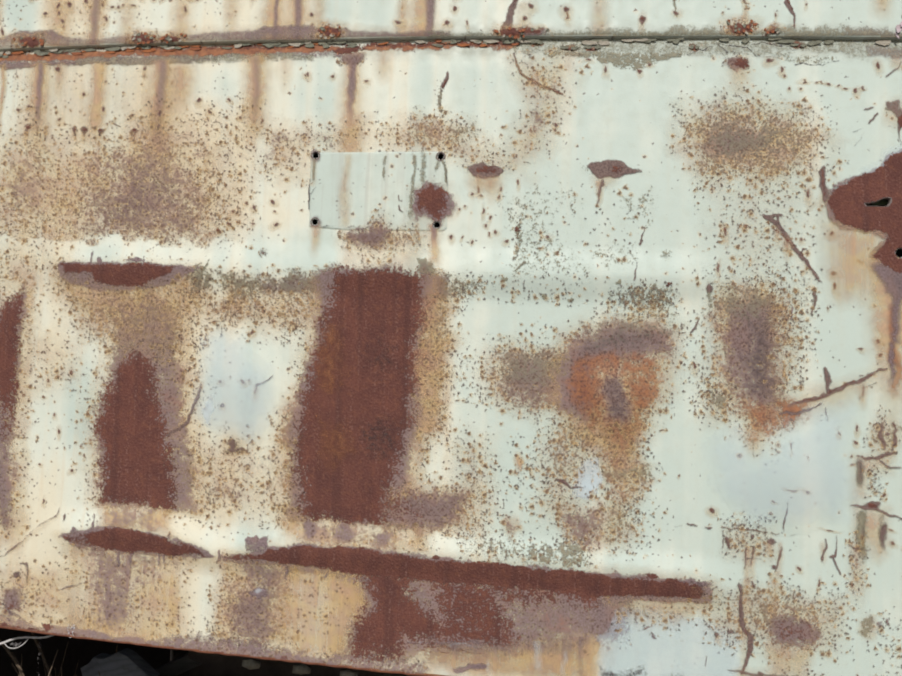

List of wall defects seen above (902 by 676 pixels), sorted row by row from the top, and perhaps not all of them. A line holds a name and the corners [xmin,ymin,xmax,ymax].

corrosion [0,0,590,255]
corrosion [666,82,835,223]